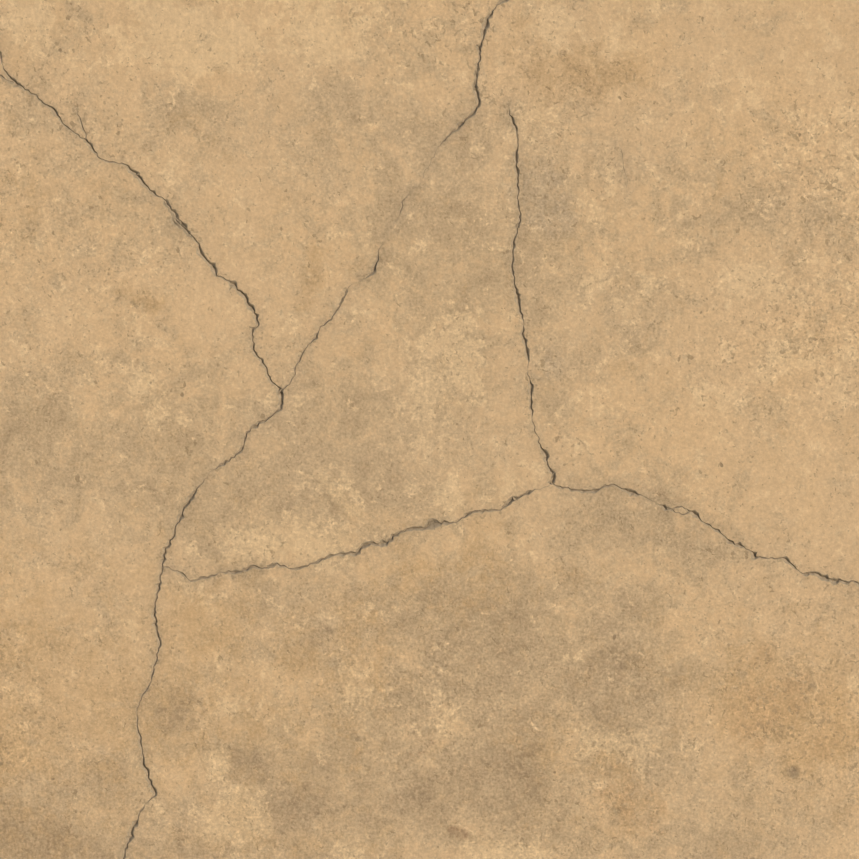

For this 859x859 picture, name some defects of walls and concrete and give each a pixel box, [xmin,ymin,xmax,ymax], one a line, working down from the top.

crack [0,51,385,471]
crack [392,0,509,227]
crack [122,106,859,859]